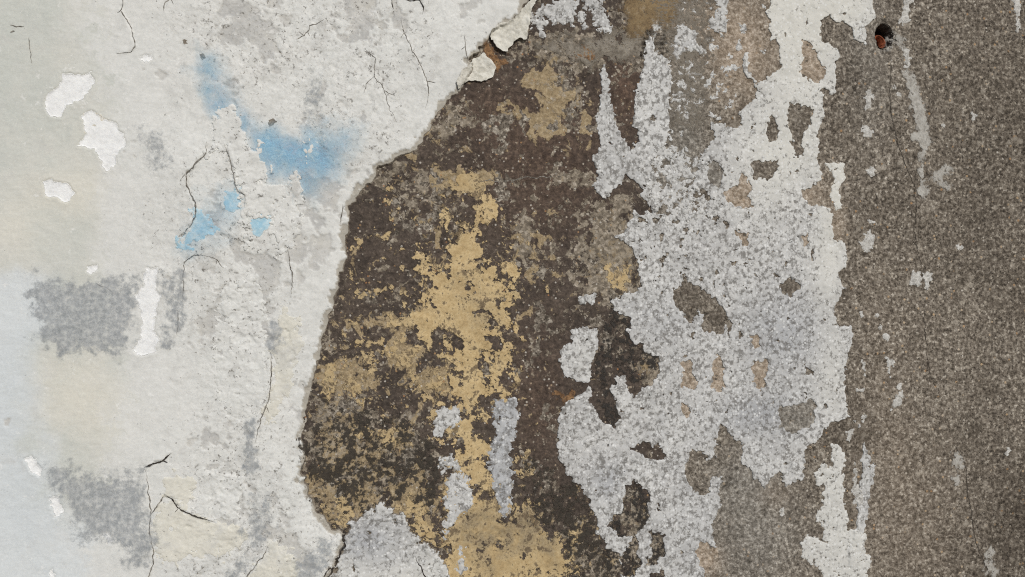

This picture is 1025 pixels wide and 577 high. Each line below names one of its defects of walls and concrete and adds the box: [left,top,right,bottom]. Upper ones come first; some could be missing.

peeling [45,71,126,171]
crack [364,54,395,118]
crack [392,0,435,108]
peeling [42,179,75,202]
flaking render [301,0,876,577]
crack [146,454,210,577]